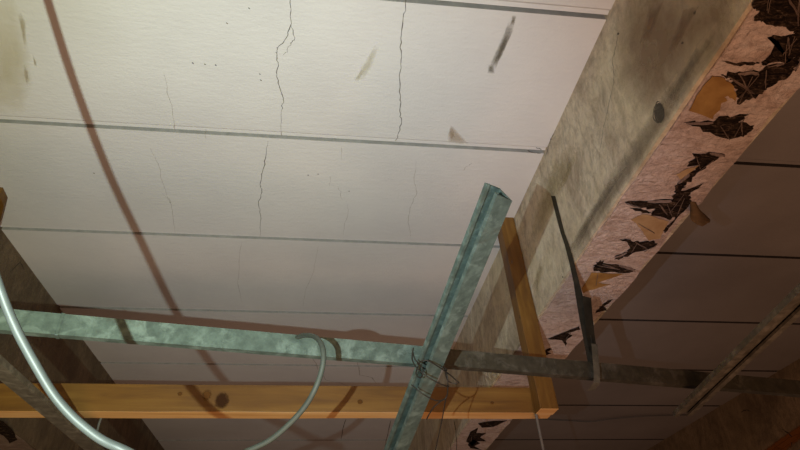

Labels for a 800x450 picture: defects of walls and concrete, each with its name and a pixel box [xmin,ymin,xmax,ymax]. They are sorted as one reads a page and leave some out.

crack [276,4,295,111]
crack [397,0,406,138]
peeling [684,0,800,140]
peeling [582,152,725,293]
peeling [545,326,580,355]
peeling [466,421,505,450]